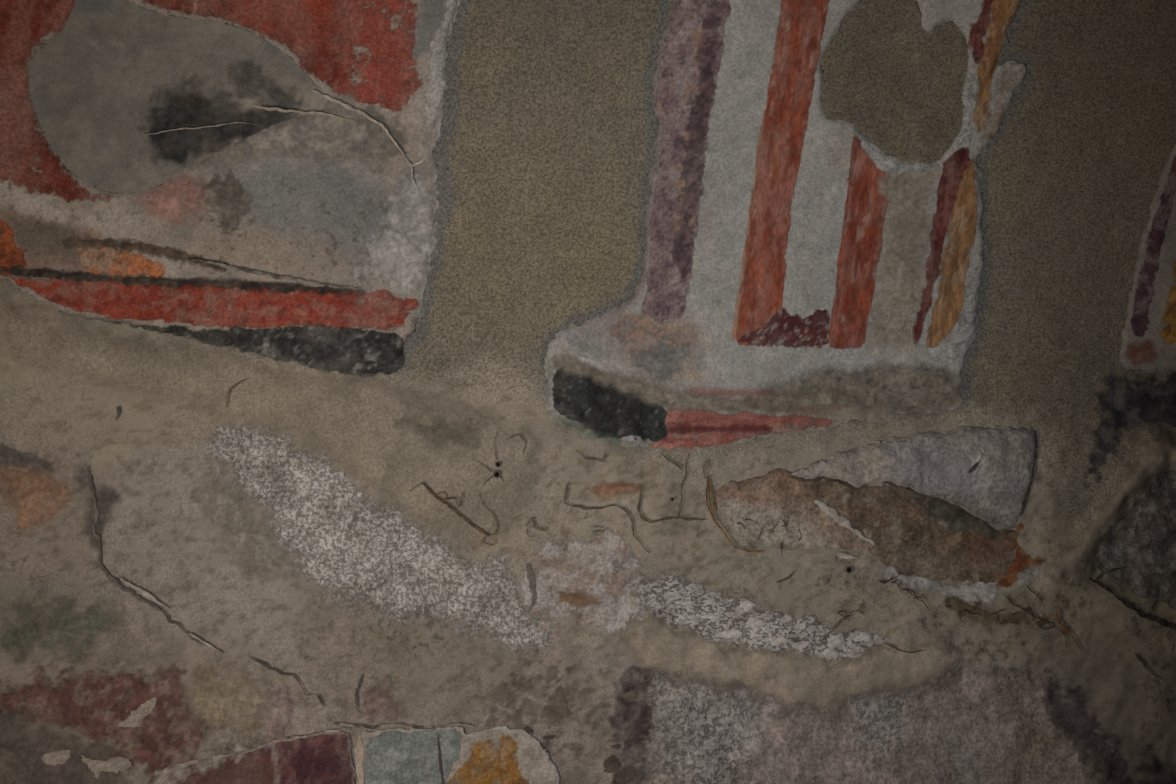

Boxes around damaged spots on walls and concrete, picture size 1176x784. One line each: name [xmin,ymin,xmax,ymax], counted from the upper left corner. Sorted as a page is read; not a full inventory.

flaking render [29,0,369,193]
spalling [422,0,457,149]
flaking render [821,0,1026,364]
crack [87,466,473,784]
crack [527,563,536,612]
crack [532,450,707,553]
spalling [714,468,1017,584]
crack [1090,566,1176,631]